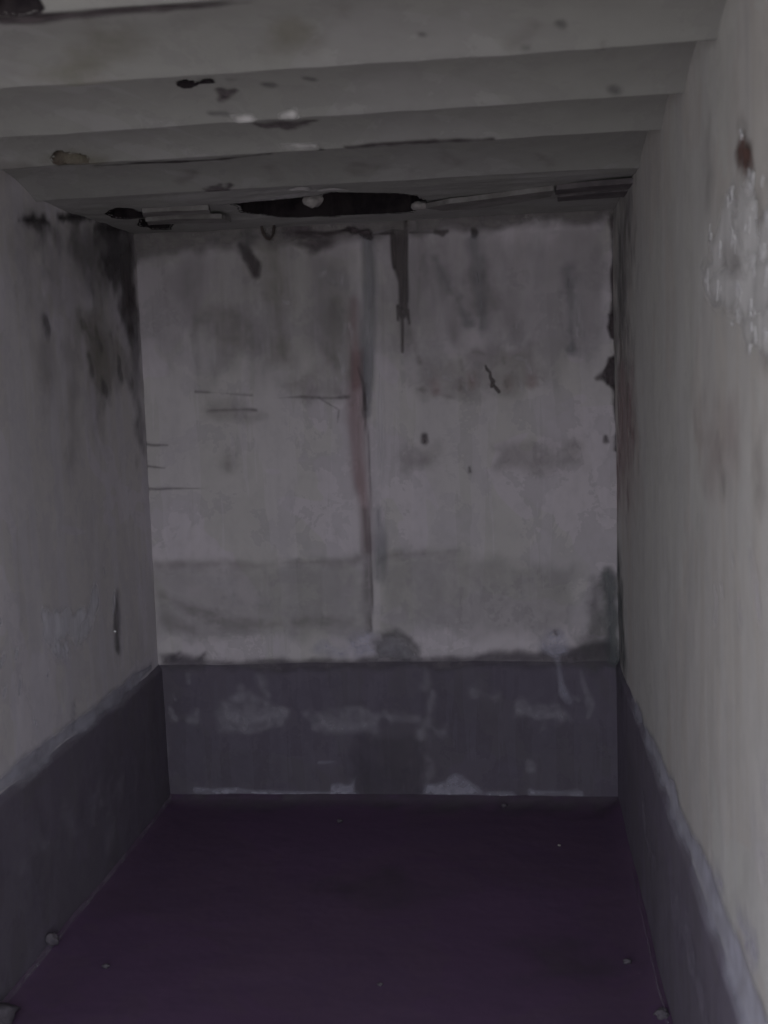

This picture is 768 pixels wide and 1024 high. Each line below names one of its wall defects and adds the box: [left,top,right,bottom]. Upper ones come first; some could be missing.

rust [737,129,752,171]
spalling [230,187,430,218]
damp [87,209,614,352]